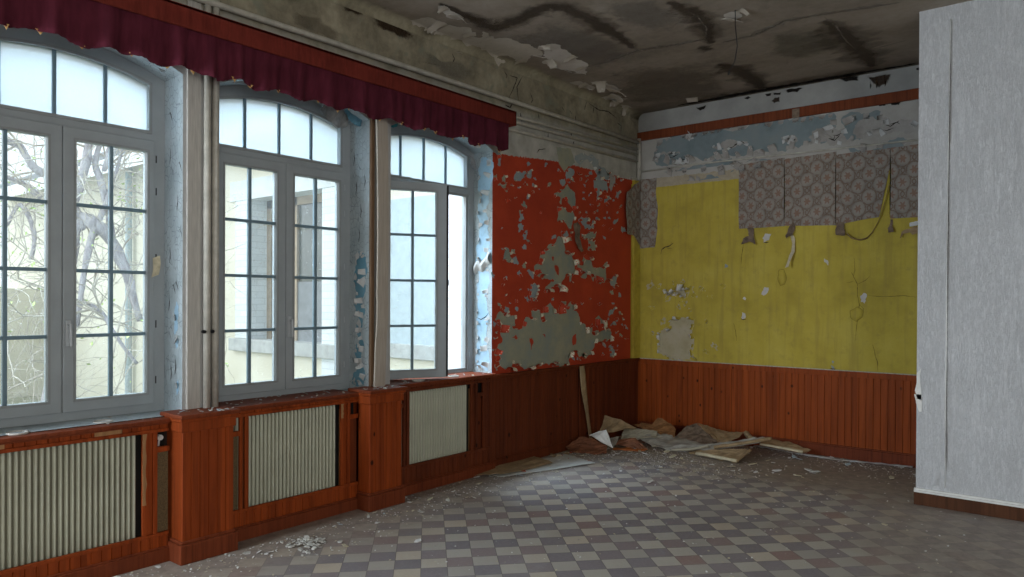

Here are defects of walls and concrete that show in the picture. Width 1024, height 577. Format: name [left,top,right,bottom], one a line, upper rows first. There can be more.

peeling [410,6,631,116]
damp [440,4,632,48]
damp [678,21,919,110]
peeling [652,110,919,181]
peeling [455,147,628,376]
peeling [343,251,425,393]
peeling [646,279,708,361]